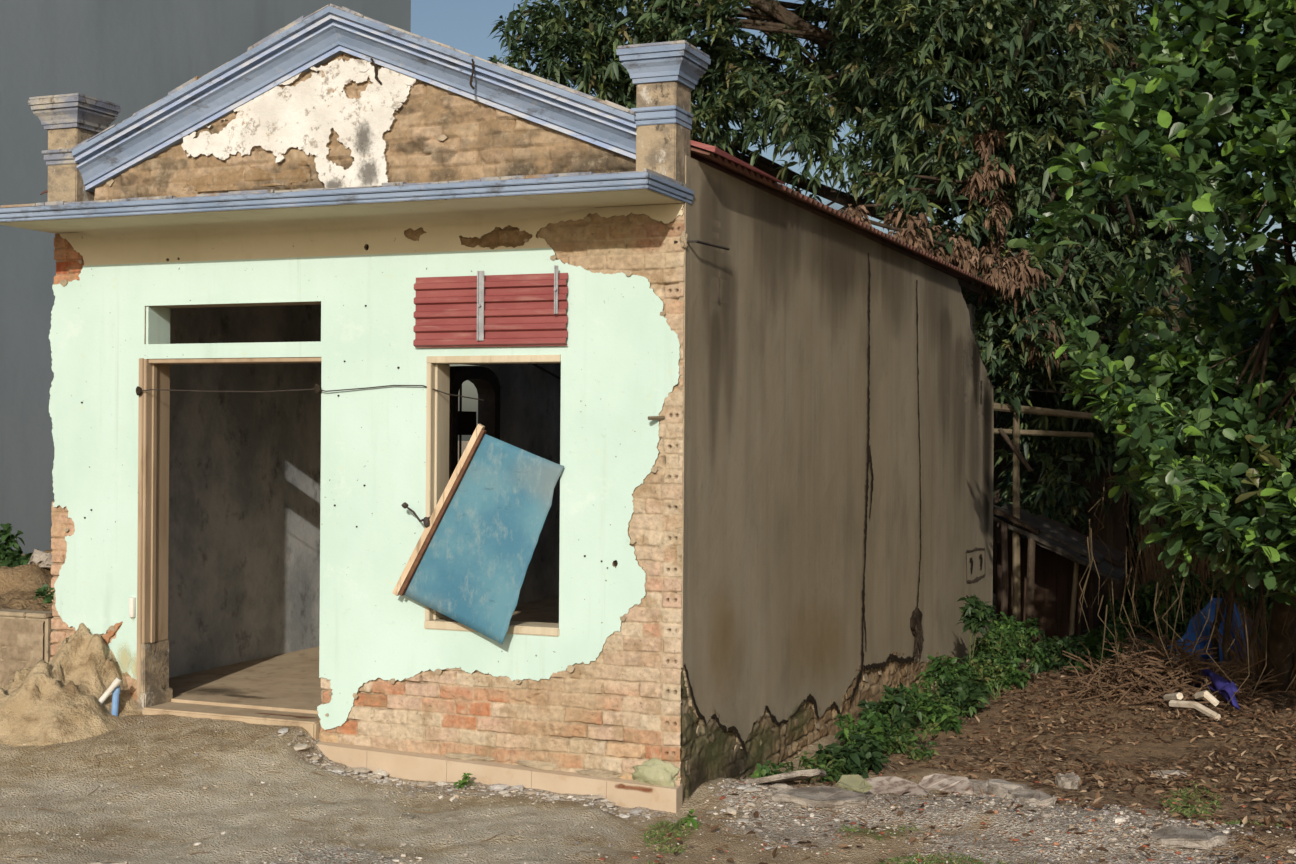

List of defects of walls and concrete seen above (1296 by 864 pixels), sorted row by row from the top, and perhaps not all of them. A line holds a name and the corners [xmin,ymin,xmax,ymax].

spalling [95,52,636,201]
spalling [54,234,84,287]
spalling [50,502,76,660]
spalling [319,208,972,804]
crack [765,253,924,726]
damp [970,339,991,521]
crack [684,665,747,756]